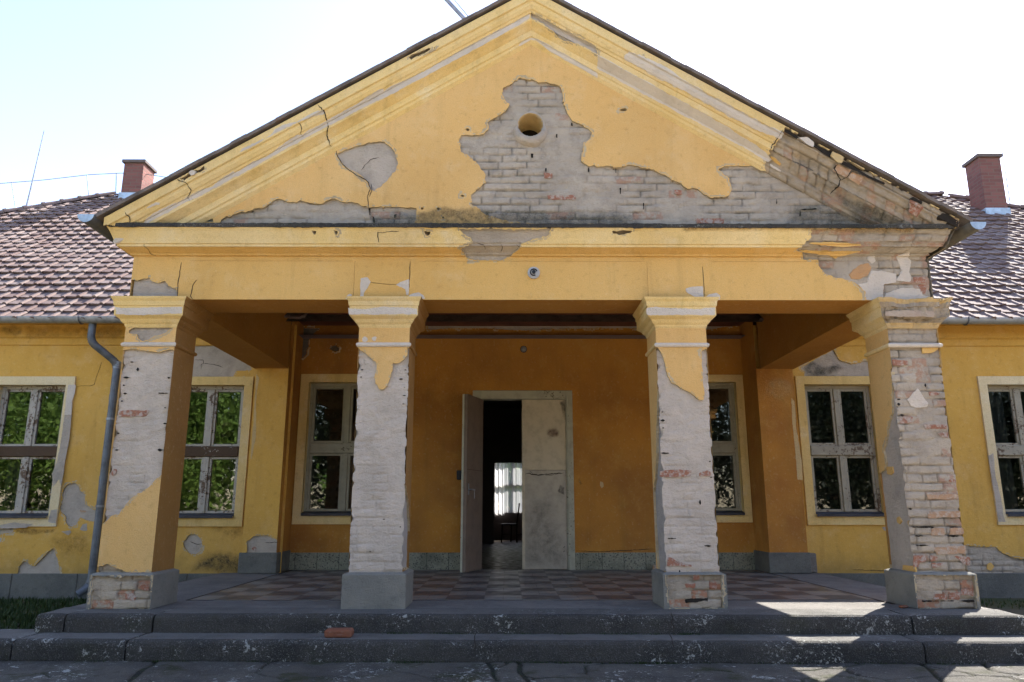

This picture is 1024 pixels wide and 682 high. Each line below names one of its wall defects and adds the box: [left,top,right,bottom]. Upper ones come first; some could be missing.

crack [299,105,379,209]
crack [830,165,852,194]
peeling [144,13,1024,609]
peeling [48,328,174,535]
peeling [19,549,60,573]